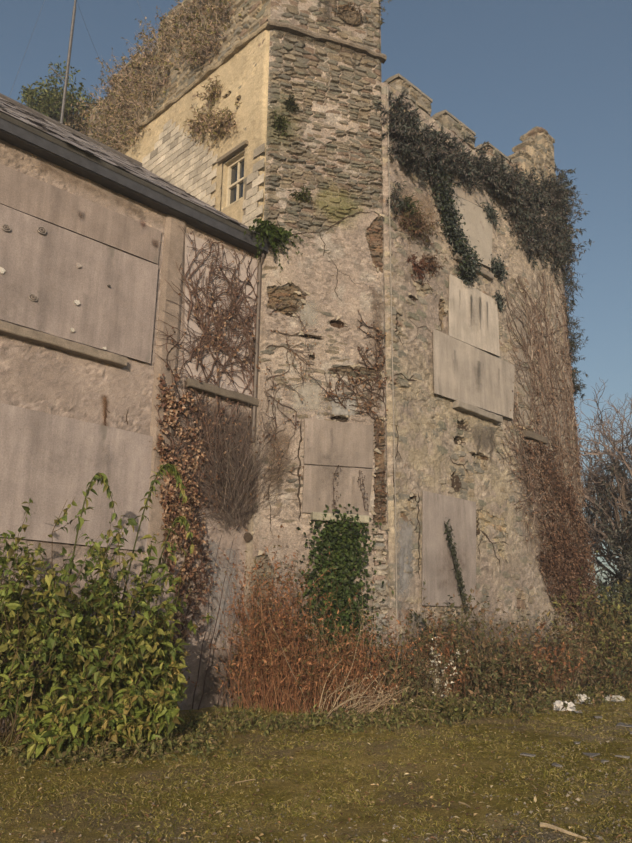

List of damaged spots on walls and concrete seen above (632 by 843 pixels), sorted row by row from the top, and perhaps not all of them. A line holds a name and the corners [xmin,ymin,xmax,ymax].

spalling [366,210,385,273]
spalling [267,279,310,316]
spalling [369,417,395,653]
leakage [208,542,238,637]